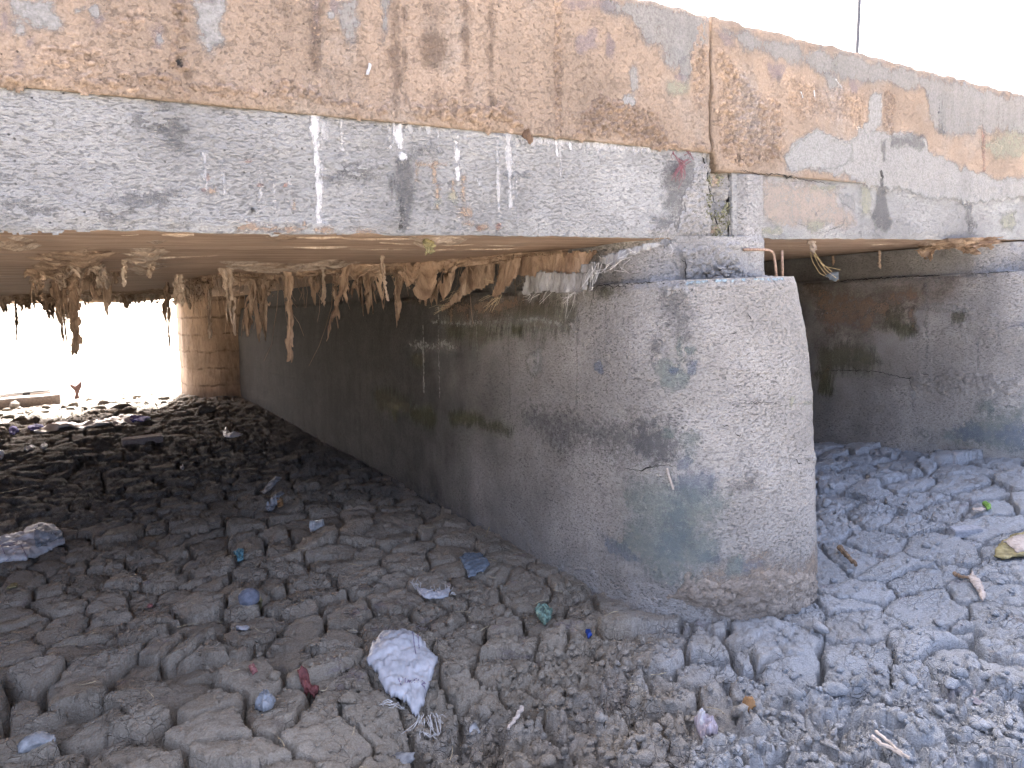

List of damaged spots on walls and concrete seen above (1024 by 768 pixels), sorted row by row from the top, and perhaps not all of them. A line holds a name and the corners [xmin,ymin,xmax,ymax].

water stain [309,115,328,223]
water stain [390,123,439,229]
water stain [873,185,892,230]
peeling [785,92,1024,205]